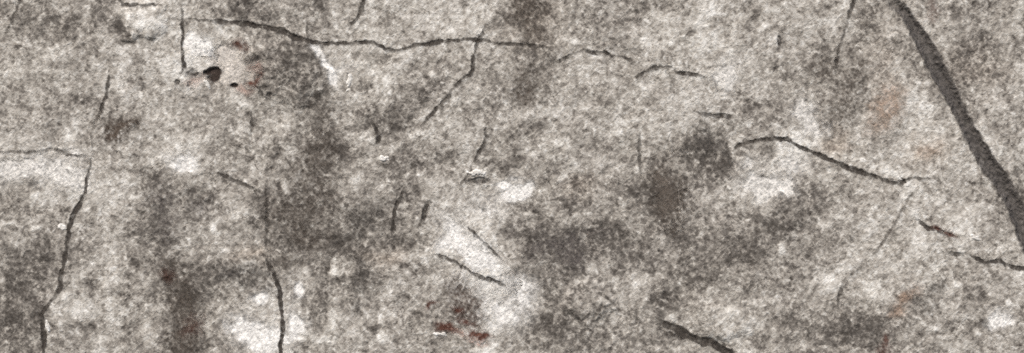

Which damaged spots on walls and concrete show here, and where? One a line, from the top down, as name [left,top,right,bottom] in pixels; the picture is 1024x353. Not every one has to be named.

crack [120,0,535,123]
crack [559,49,699,78]
crack [734,136,929,197]
crack [6,149,91,353]
crack [439,229,501,285]
crack [920,221,1024,271]
crack [267,262,285,353]
crack [661,321,734,353]